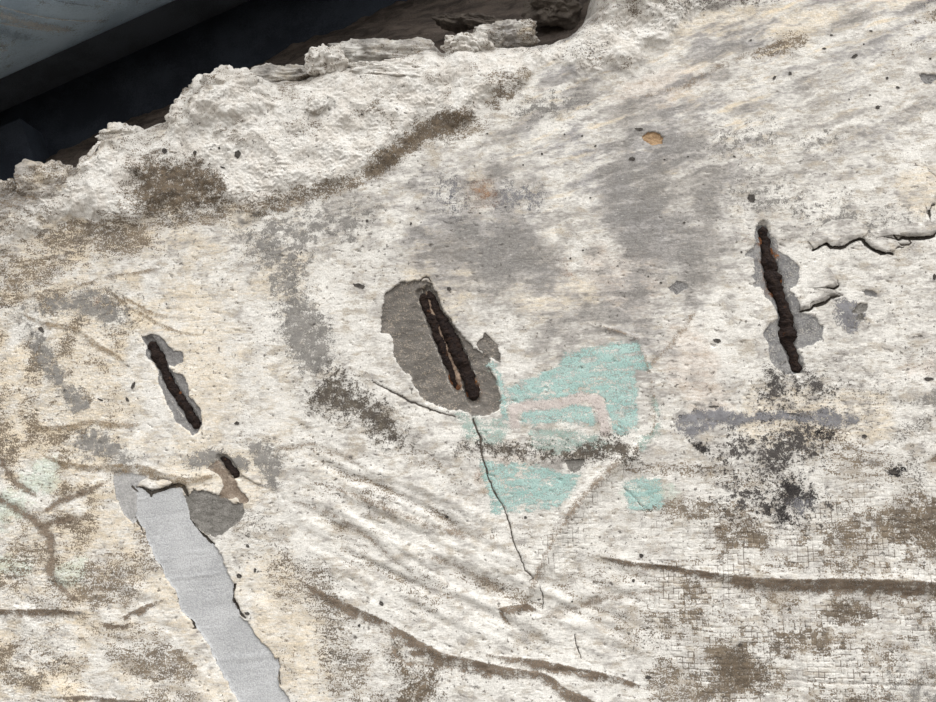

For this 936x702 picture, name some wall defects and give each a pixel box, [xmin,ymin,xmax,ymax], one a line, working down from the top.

spalling [634,128,663,145]
peeling [808,201,936,253]
spalling [740,225,842,375]
spalling [142,334,202,435]
spalling [381,280,501,416]
spalling [113,471,173,523]
spalling [184,456,261,538]